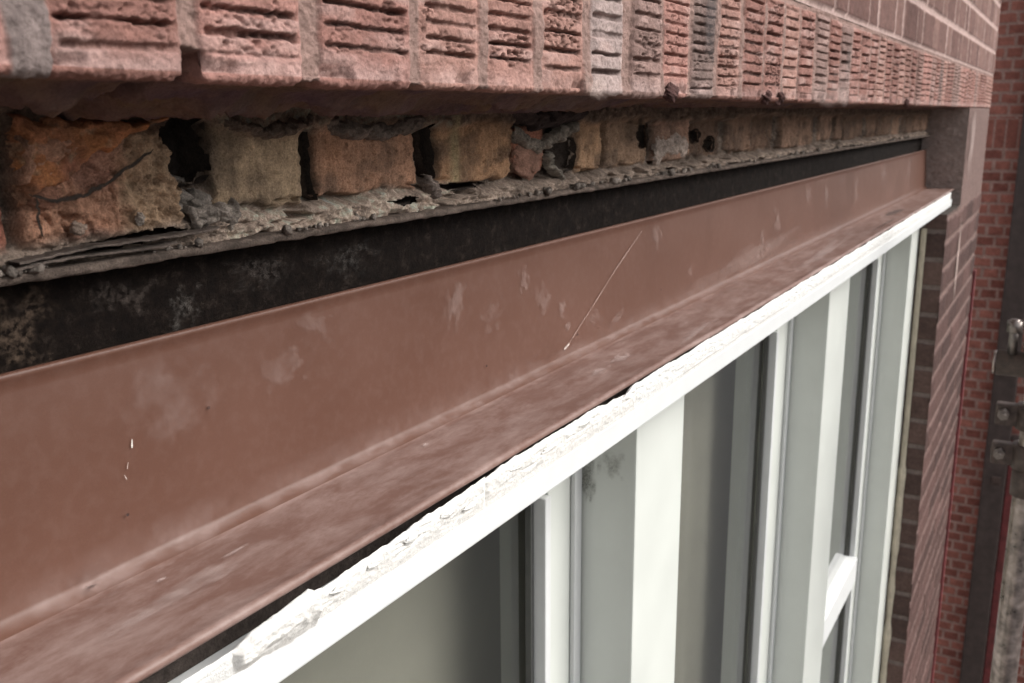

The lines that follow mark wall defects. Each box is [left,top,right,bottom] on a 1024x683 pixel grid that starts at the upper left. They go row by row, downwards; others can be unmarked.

spalling [5,113,169,211]
spalling [510,145,543,180]
crack [29,150,153,238]
peeling [387,196,416,205]
peeling [442,181,483,191]
peeling [69,212,188,253]